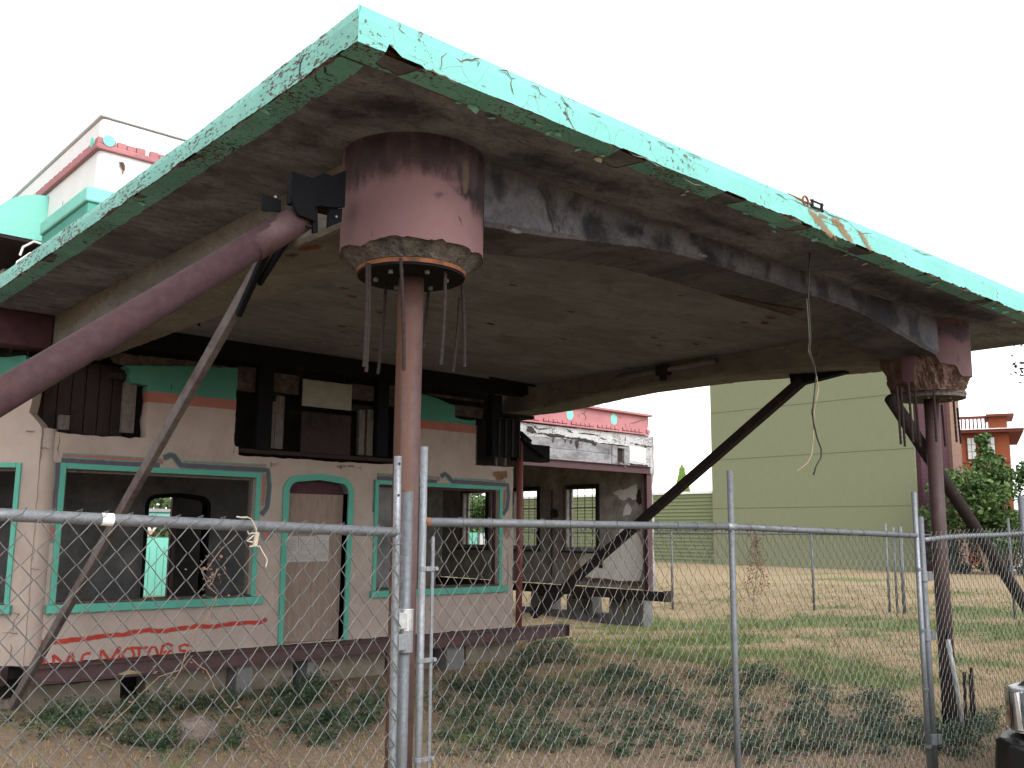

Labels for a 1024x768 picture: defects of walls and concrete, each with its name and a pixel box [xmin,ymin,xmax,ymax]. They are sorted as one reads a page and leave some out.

crack [427,53,601,129]
spalling [0,41,1024,324]
crack [629,141,702,185]
spalling [881,355,973,394]
peeling [527,426,597,446]